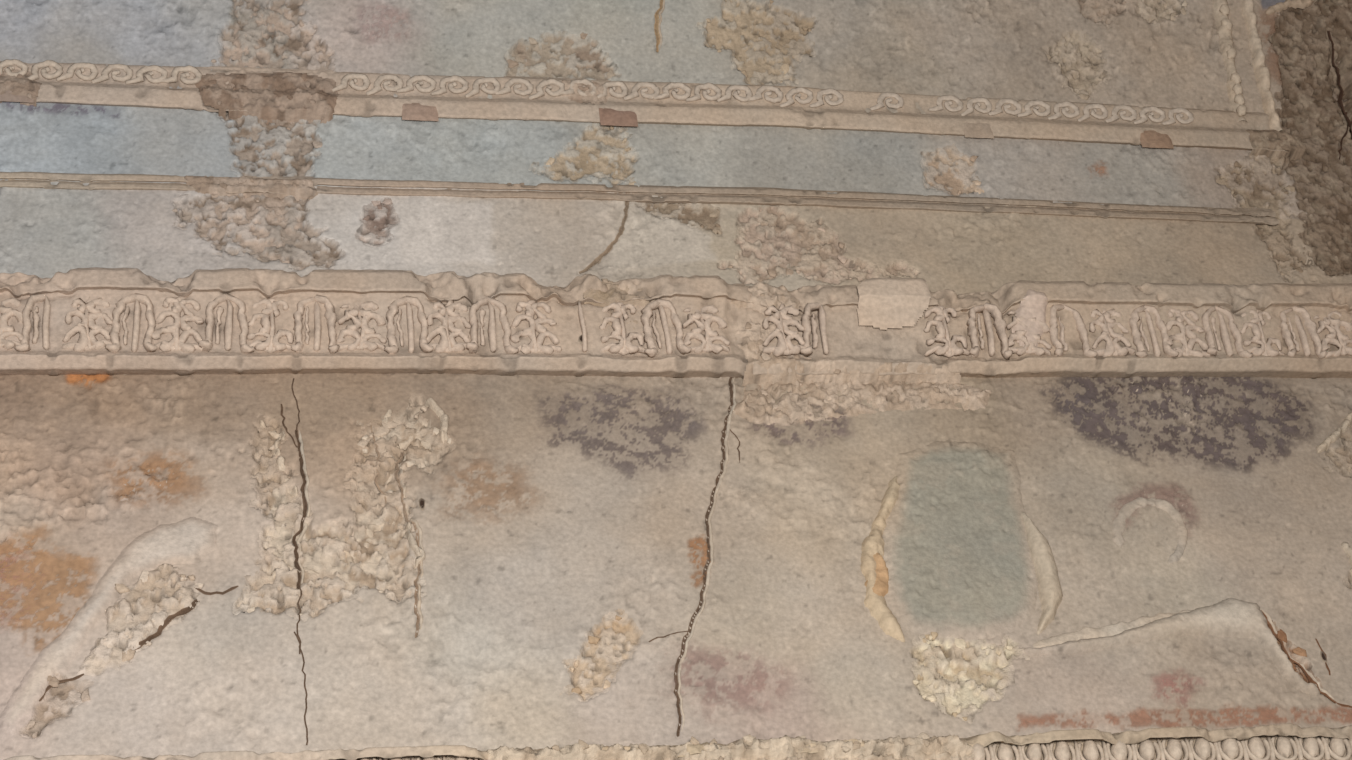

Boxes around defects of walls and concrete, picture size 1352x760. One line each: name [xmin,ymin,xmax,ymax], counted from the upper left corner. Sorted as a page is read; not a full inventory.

spalling [171,111,346,271]
spalling [355,197,400,248]
crack [654,0,665,52]
spalling [1213,0,1352,282]
crack [1327,31,1352,160]
crack [280,378,310,745]
spalling [232,395,457,622]
damp [549,391,699,473]
crack [648,377,740,737]
damp [1054,376,1311,469]
spalling [18,563,204,739]
crack [1261,610,1352,708]